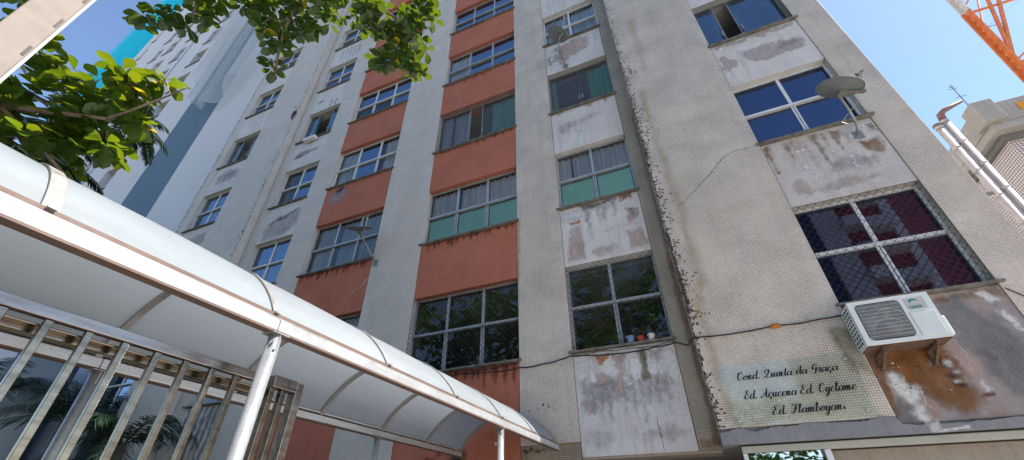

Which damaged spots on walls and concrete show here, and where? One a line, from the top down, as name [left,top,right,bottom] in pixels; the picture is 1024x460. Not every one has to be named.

peeling [604,1,726,432]
peeling [576,349,681,395]
water stain [631,349,659,381]
rust [866,347,977,415]
water stain [936,290,1024,394]